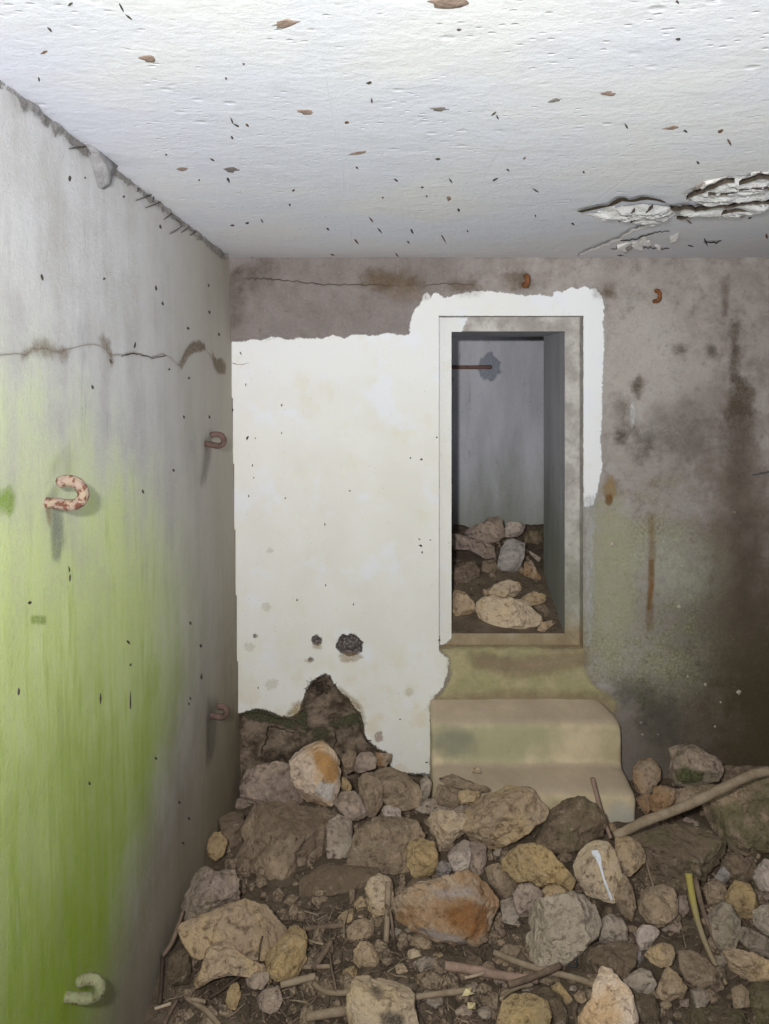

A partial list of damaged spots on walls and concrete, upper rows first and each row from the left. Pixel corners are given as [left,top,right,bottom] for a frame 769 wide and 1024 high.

crack [245,278,472,287]
crack [0,343,247,366]
spalling [335,634,363,660]
spalling [239,674,390,782]